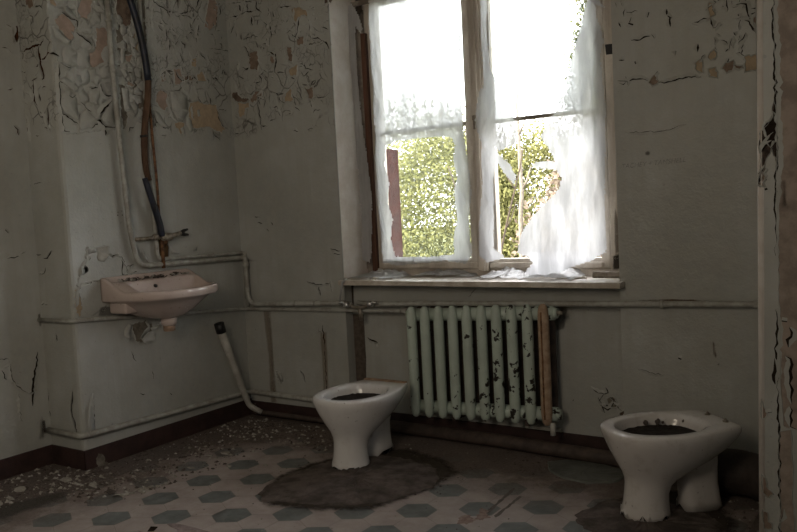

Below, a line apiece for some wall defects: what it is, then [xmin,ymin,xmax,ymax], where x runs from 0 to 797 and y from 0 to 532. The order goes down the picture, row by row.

peeling [692,0,756,33]
peeling [24,0,149,135]
peeling [231,46,313,130]
peeling [76,244,189,290]
peeling [756,0,797,532]
crack [0,352,51,424]
crack [69,392,77,432]